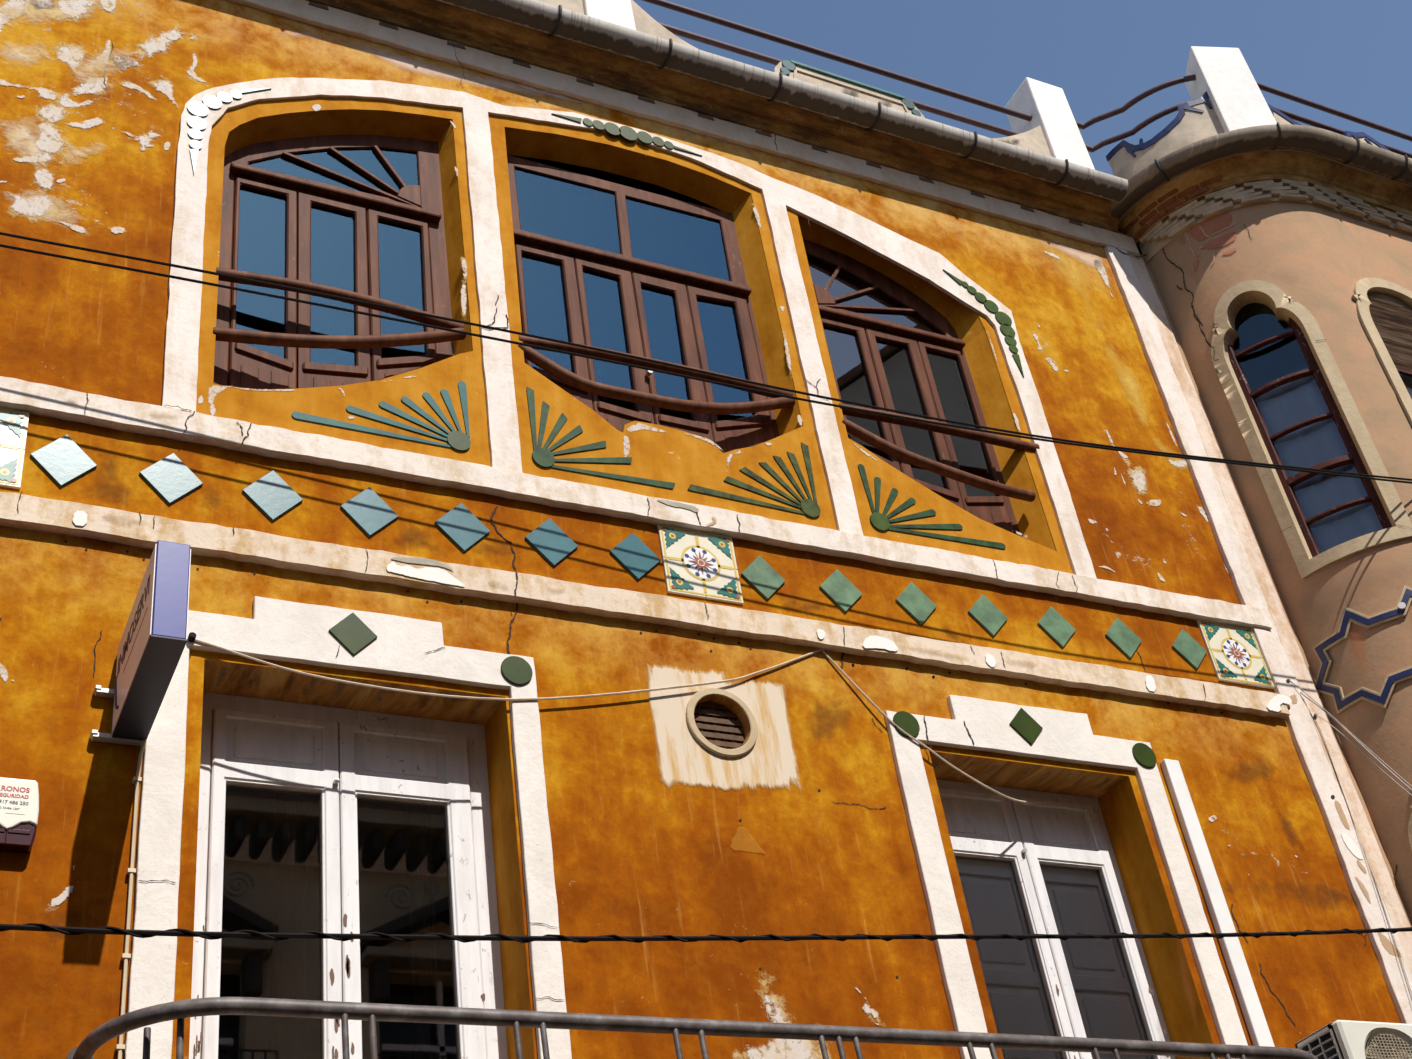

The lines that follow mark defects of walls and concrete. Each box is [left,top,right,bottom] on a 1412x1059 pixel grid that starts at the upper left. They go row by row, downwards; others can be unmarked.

peeling [0,0,206,234]
peeling [1095,256,1114,298]
crack [1116,221,1252,361]
peeling [1033,325,1068,372]
peeling [1104,430,1161,506]
crack [491,506,518,654]
peeling [733,977,831,1059]